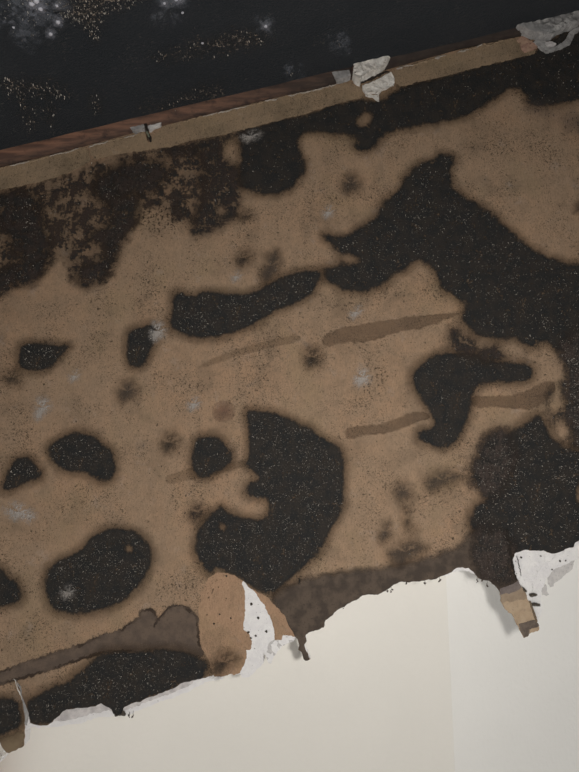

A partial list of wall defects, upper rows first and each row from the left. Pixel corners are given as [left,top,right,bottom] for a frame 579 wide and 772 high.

flaking render [533,26,579,54]
flaking render [332,70,351,84]
flaking render [362,72,395,102]
leakage [0,21,579,297]
leakage [0,153,579,753]
crack [14,679,29,725]